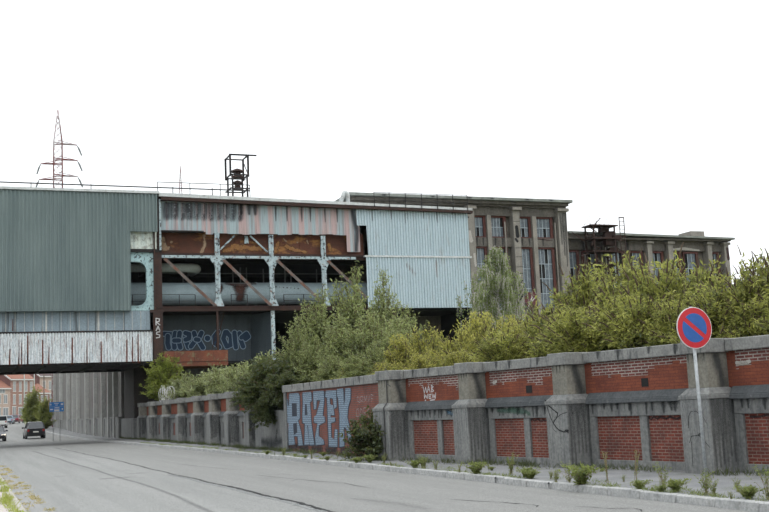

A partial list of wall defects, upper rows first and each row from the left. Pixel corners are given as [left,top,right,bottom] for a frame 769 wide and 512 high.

rust [9,336,29,365]
rust [126,334,141,363]